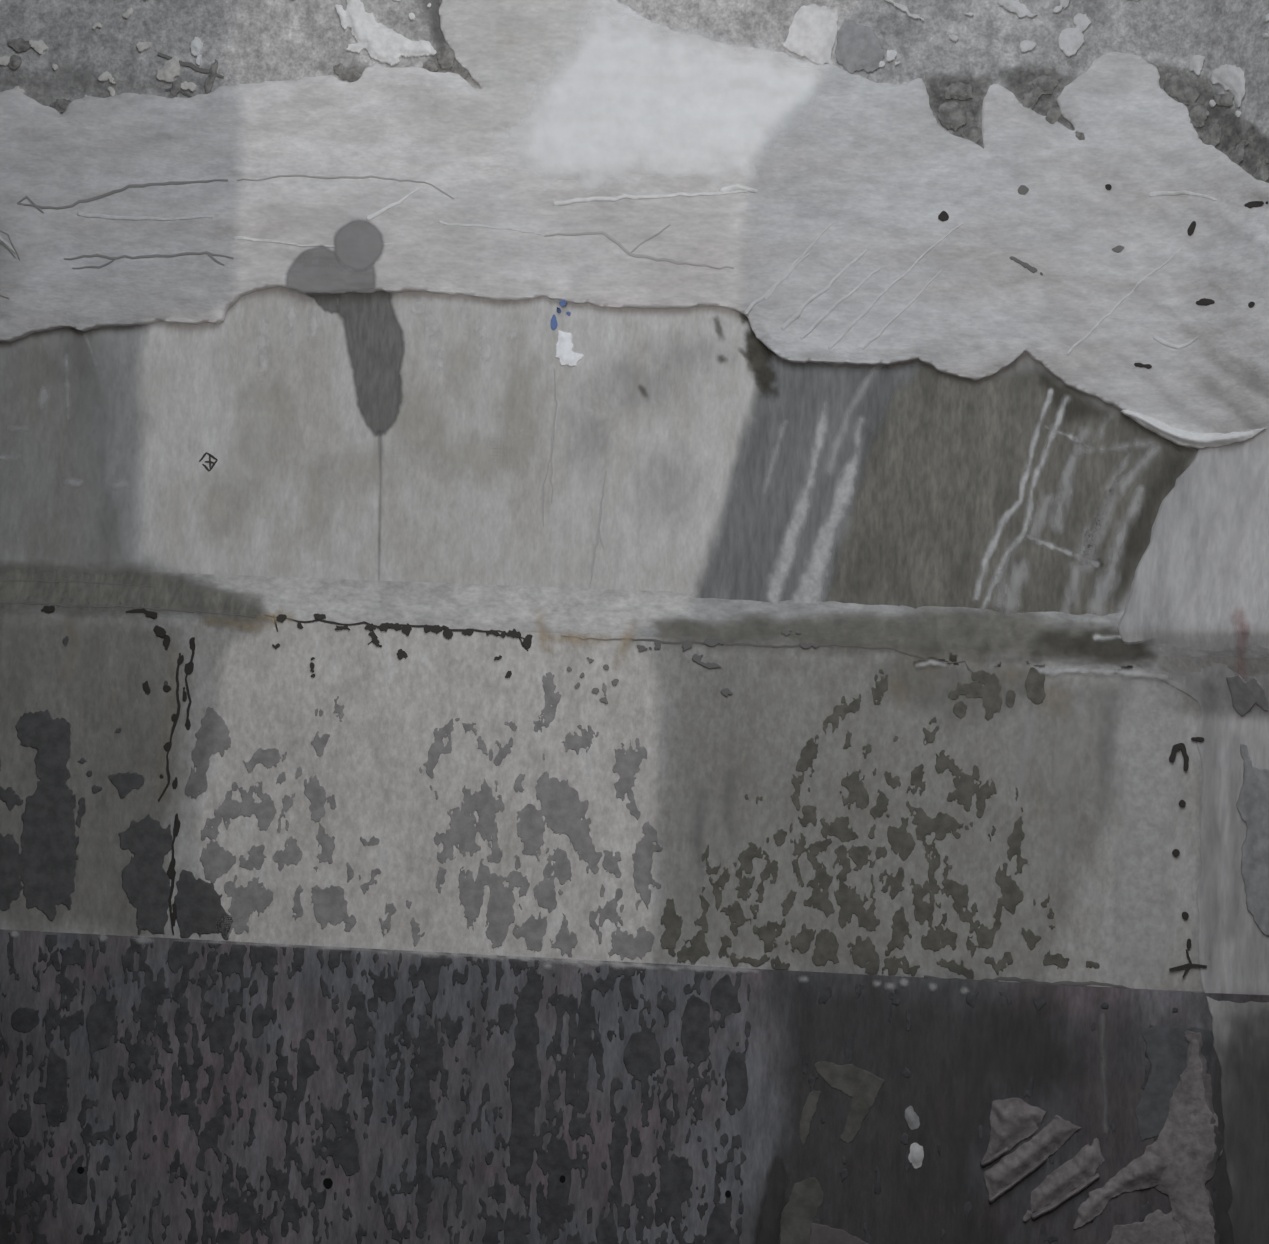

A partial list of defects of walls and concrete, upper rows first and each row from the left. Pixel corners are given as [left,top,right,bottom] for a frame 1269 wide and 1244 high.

spalling [926,77,987,143]
spalling [1010,69,1085,140]
spalling [1156,66,1269,182]
crack [17,175,454,213]
crack [0,230,20,260]
crack [64,251,234,269]
leakage [287,220,404,457]
leakage [662,329,1191,679]
crack [265,614,528,651]
spalling [365,622,533,659]
peeling [0,667,1070,1244]
peeling [1106,1030,1223,1244]